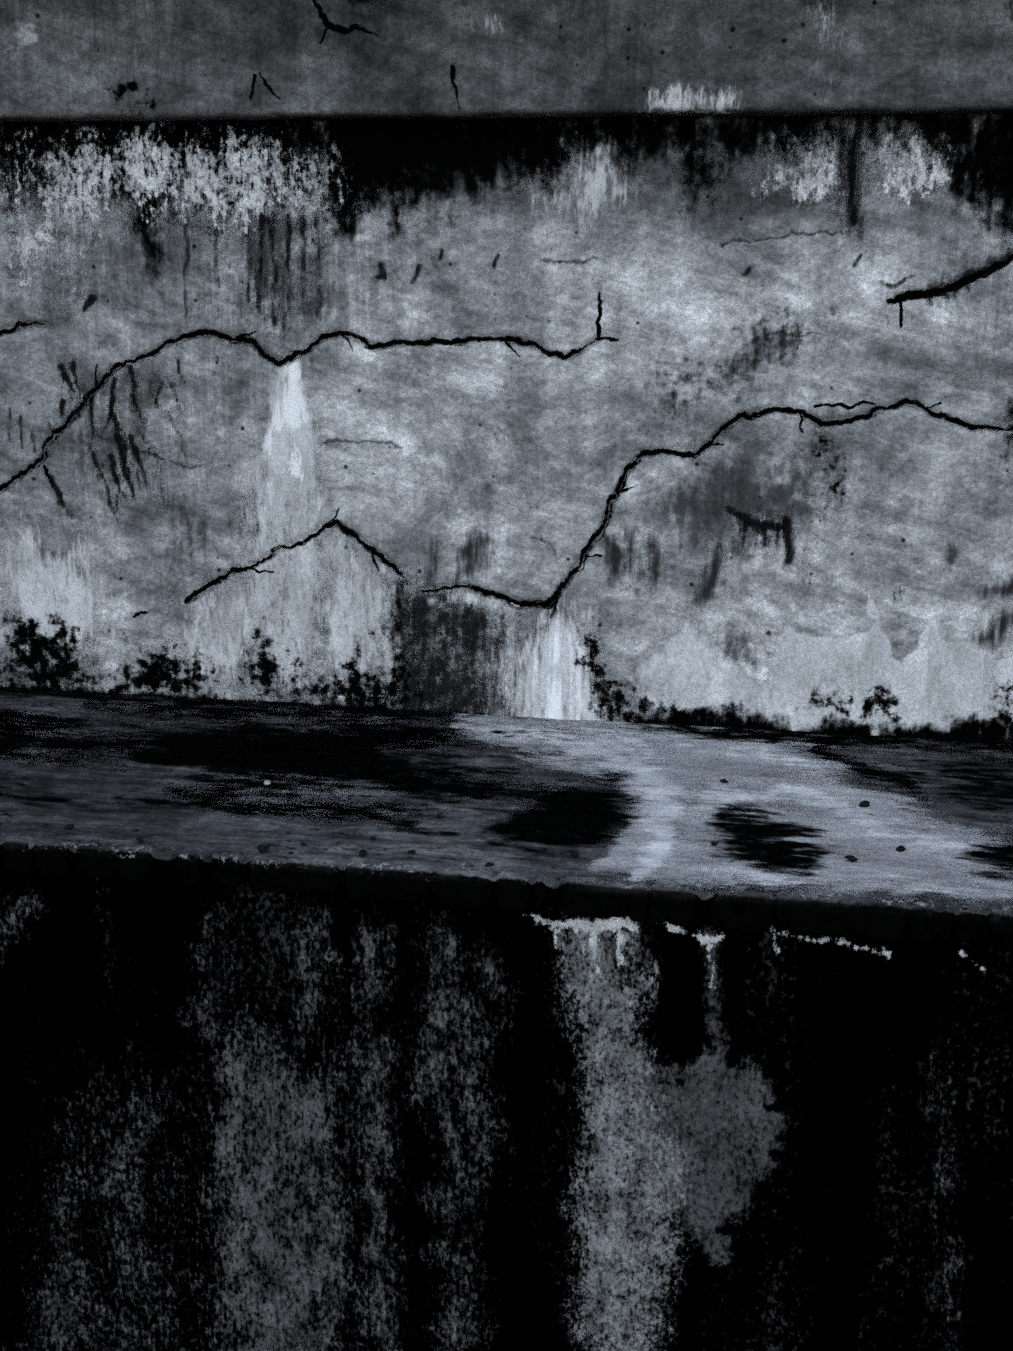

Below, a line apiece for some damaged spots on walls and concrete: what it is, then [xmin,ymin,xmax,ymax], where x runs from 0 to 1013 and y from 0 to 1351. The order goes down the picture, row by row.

leakage [0,81,1013,331]
crack [540,256,597,264]
crack [0,292,619,491]
leakage [0,355,1013,900]
crack [184,398,1013,619]
leakage [770,925,891,959]
efflorescence [38,1093,180,1351]
efflorescence [179,912,404,1351]
efflorescence [411,938,498,1221]
efflorescence [429,1242,481,1350]
efflorescence [531,914,784,1351]